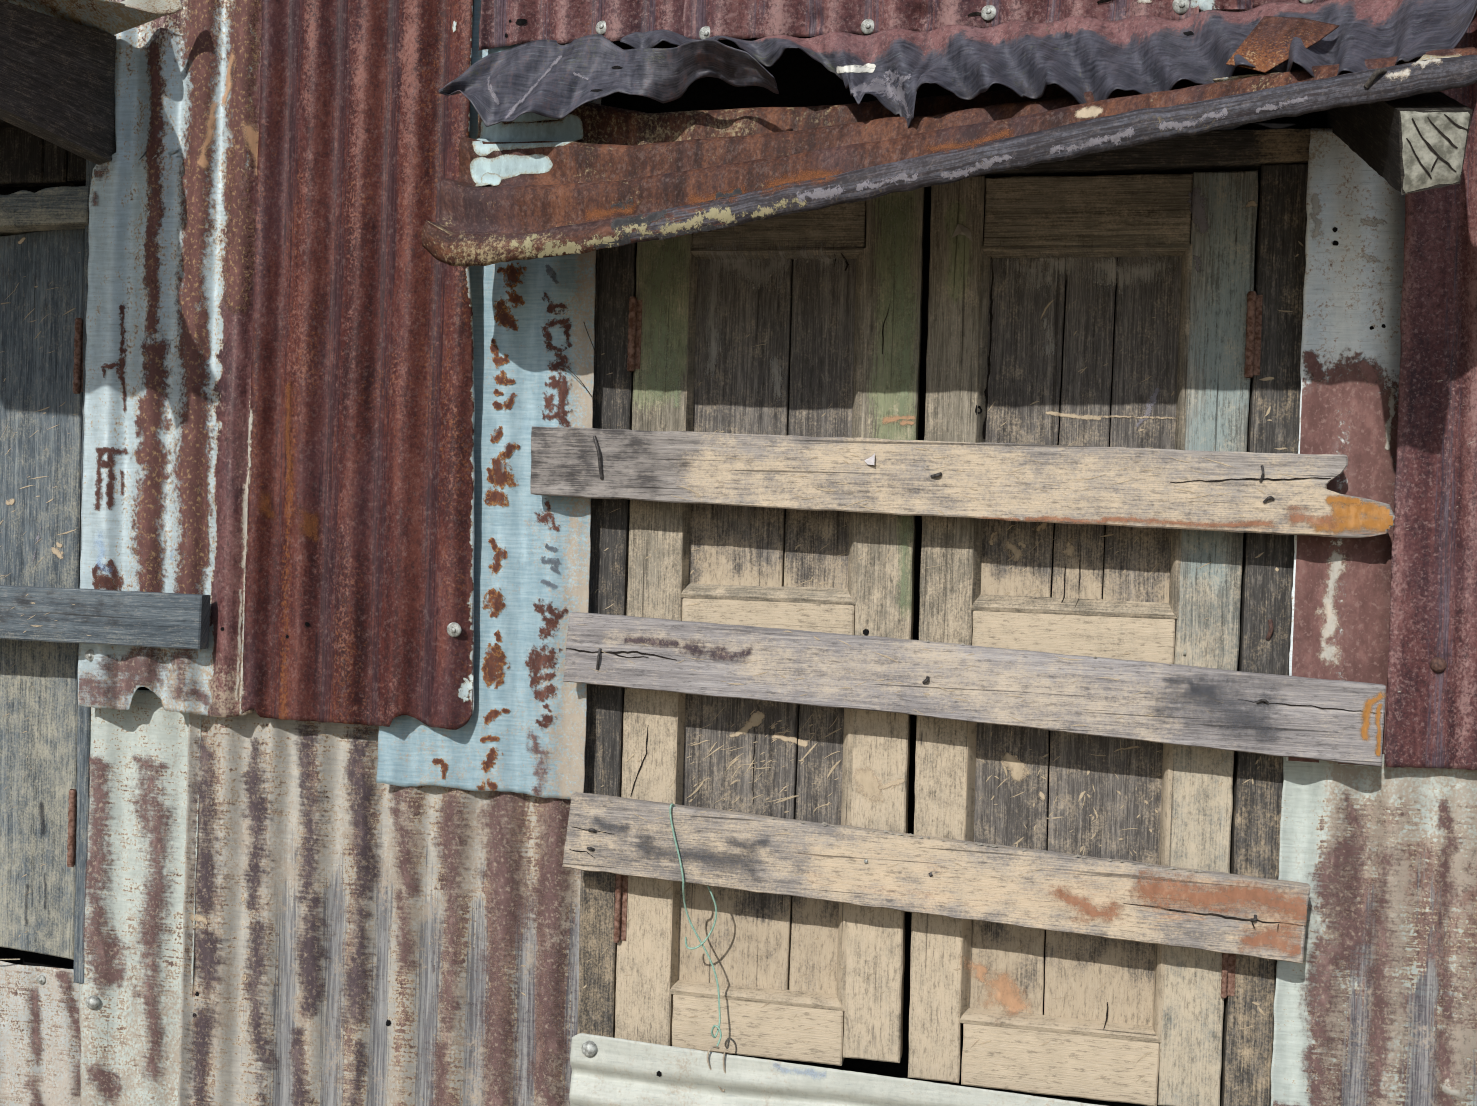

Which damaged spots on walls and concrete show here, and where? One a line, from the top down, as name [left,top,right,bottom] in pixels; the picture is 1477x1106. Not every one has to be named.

peeling [1191,0,1216,11]
rust [55,971,121,1105]
rust [78,646,221,715]
rust [92,0,262,595]
rust [83,721,420,1106]
rust [431,537,581,1106]
rust [483,263,572,507]
rust [534,498,560,531]
rust [688,170,840,205]
rust [1273,793,1402,1106]
rust [1292,349,1399,754]
rust [1424,799,1461,1106]